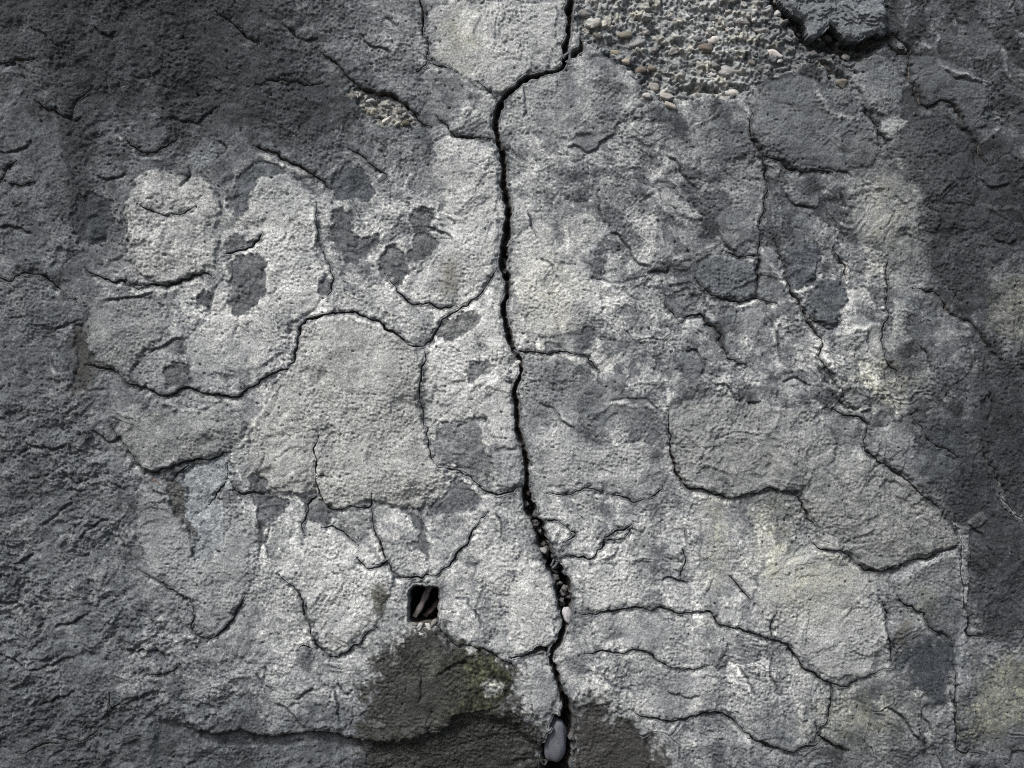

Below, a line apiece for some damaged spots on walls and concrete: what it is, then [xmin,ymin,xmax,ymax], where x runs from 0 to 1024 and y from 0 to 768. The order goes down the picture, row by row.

crack [0,56,34,66]
crack [34,85,102,123]
spalling [573,0,905,110]
crack [884,30,989,166]
crack [0,160,34,188]
crack [0,270,77,303]
crack [879,256,1005,377]
crack [84,0,895,768]
crack [548,406,1002,641]
crack [911,415,1024,523]
crack [17,647,181,756]
crack [952,665,1024,763]